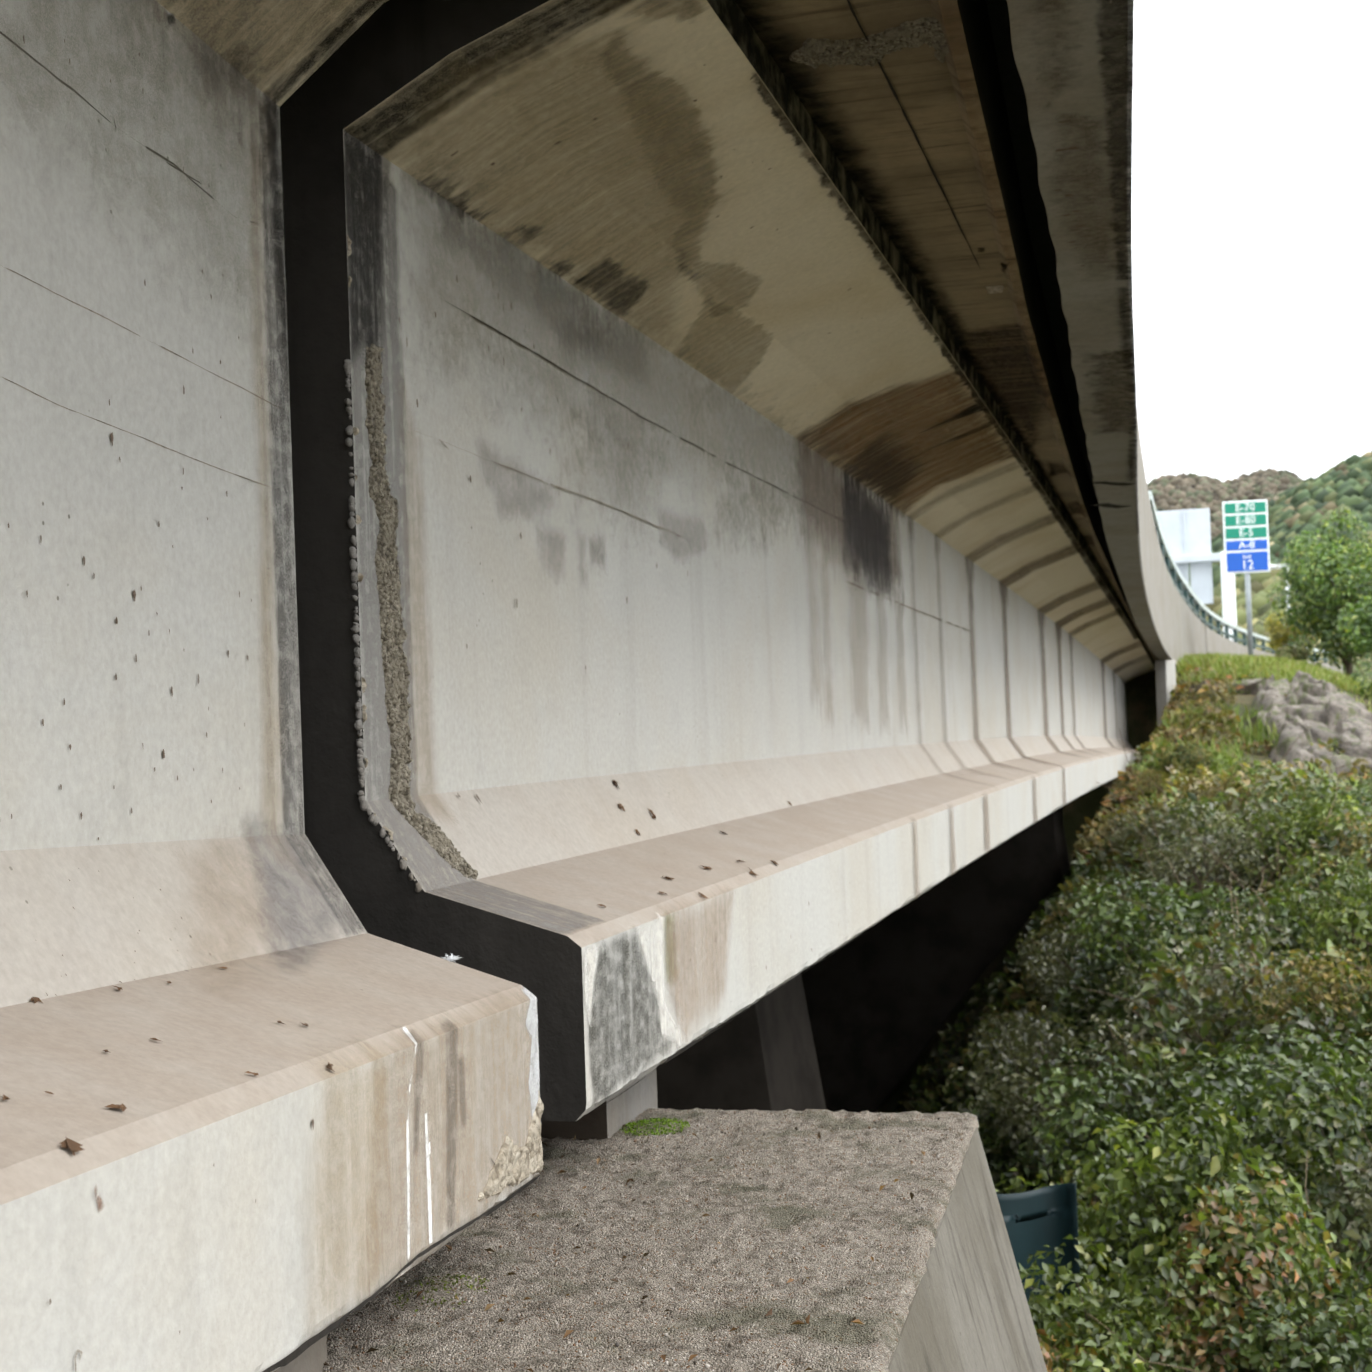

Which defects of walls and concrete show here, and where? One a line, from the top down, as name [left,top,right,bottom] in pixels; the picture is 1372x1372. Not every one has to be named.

crack [0,31,260,225]
crack [2,377,274,489]
crack [6,268,278,407]
damp [344,0,1154,768]
damp [585,948,595,1011]
damp [640,910,726,1045]
spalling [477,1089,544,1202]